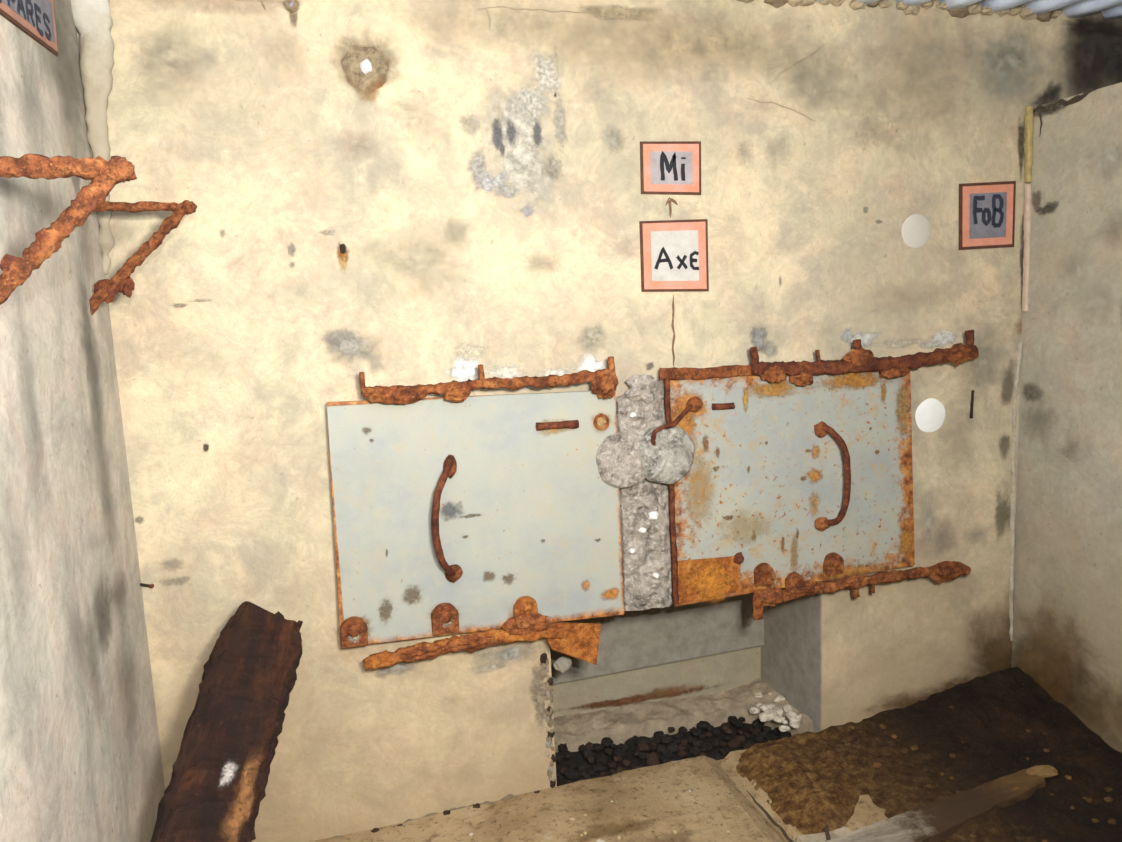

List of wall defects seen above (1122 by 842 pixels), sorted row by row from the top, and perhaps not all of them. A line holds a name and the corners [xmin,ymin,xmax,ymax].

spalling [339,42,393,98]
damp [1072,18,1122,91]
damp [1035,86,1060,105]
peeling [470,54,566,197]
corrosion [0,253,23,271]
corrosion [94,277,135,304]
corrosion [672,392,706,439]
corrosion [743,383,792,410]
corrosion [823,372,908,432]
peeling [638,511,659,534]
corrosion [602,588,619,599]
corrosion [683,562,741,600]